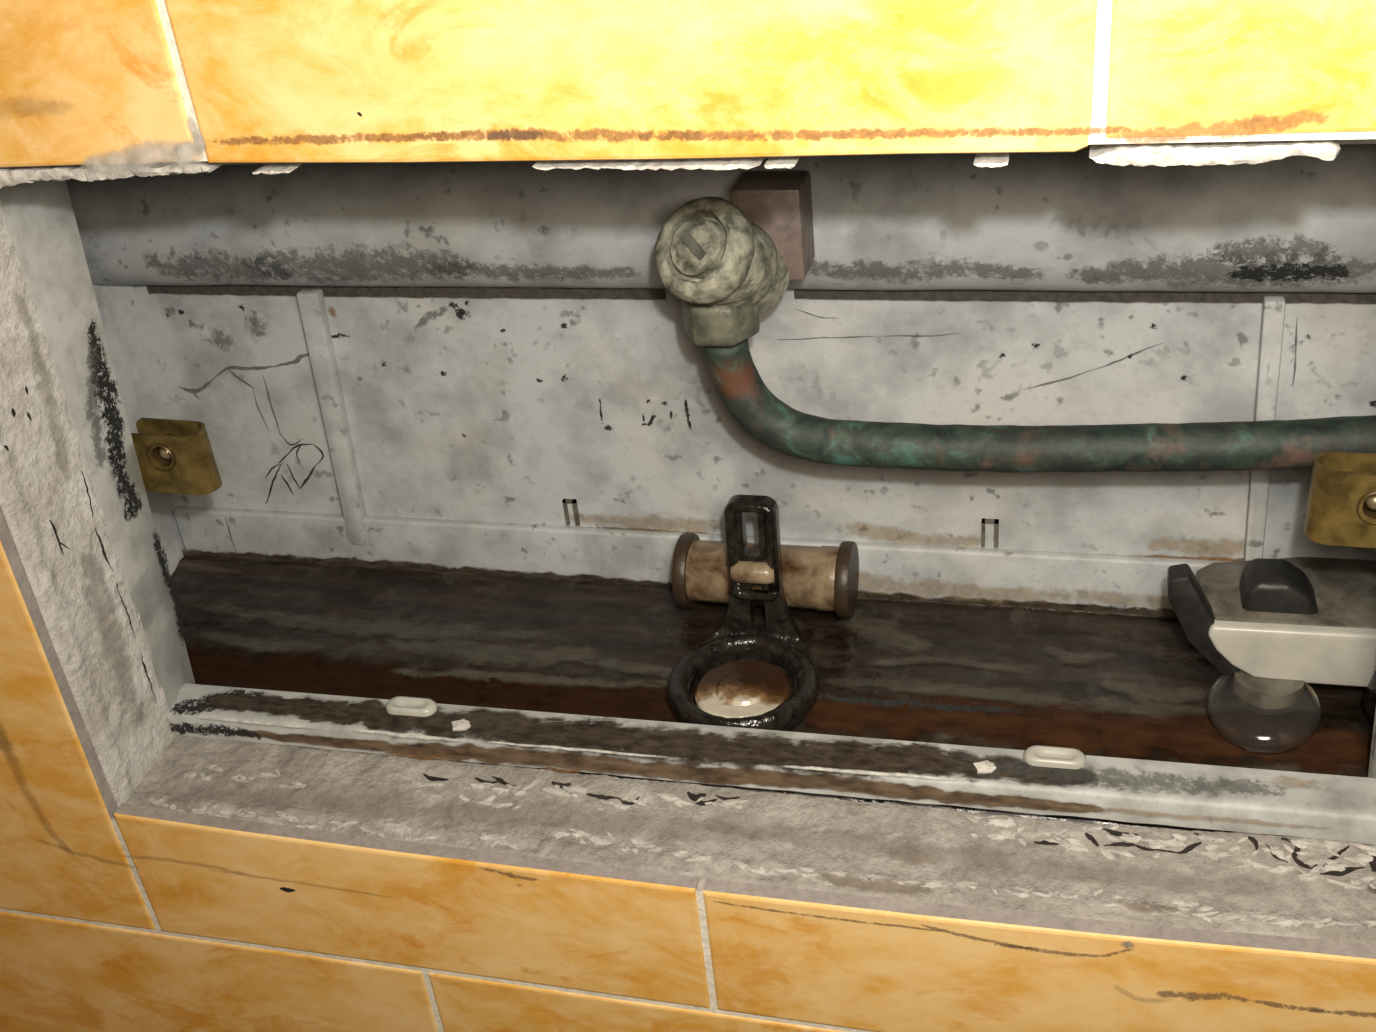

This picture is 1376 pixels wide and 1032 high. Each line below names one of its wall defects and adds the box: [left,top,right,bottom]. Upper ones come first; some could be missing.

damp [146,251,666,336]
damp [794,238,1376,304]
damp [87,318,142,521]
damp [641,399,691,431]
damp [153,531,672,643]
crack [1034,828,1376,876]